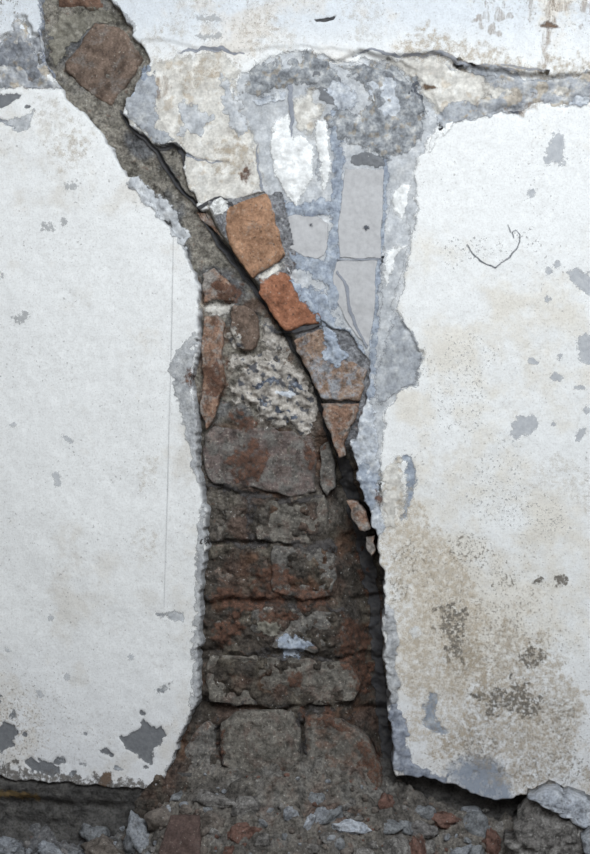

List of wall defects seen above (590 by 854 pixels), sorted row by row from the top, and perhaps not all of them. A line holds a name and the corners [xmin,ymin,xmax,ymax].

crack [353,48,544,72]
crack [467,226,520,268]
peeling [545,260,590,295]
peeling [578,333,590,365]
flaking render [0,0,449,819]
crack [120,110,393,758]
peeling [510,415,538,441]
damp [533,574,568,587]
damp [431,601,469,671]
damp [518,638,548,668]
damp [443,673,584,799]